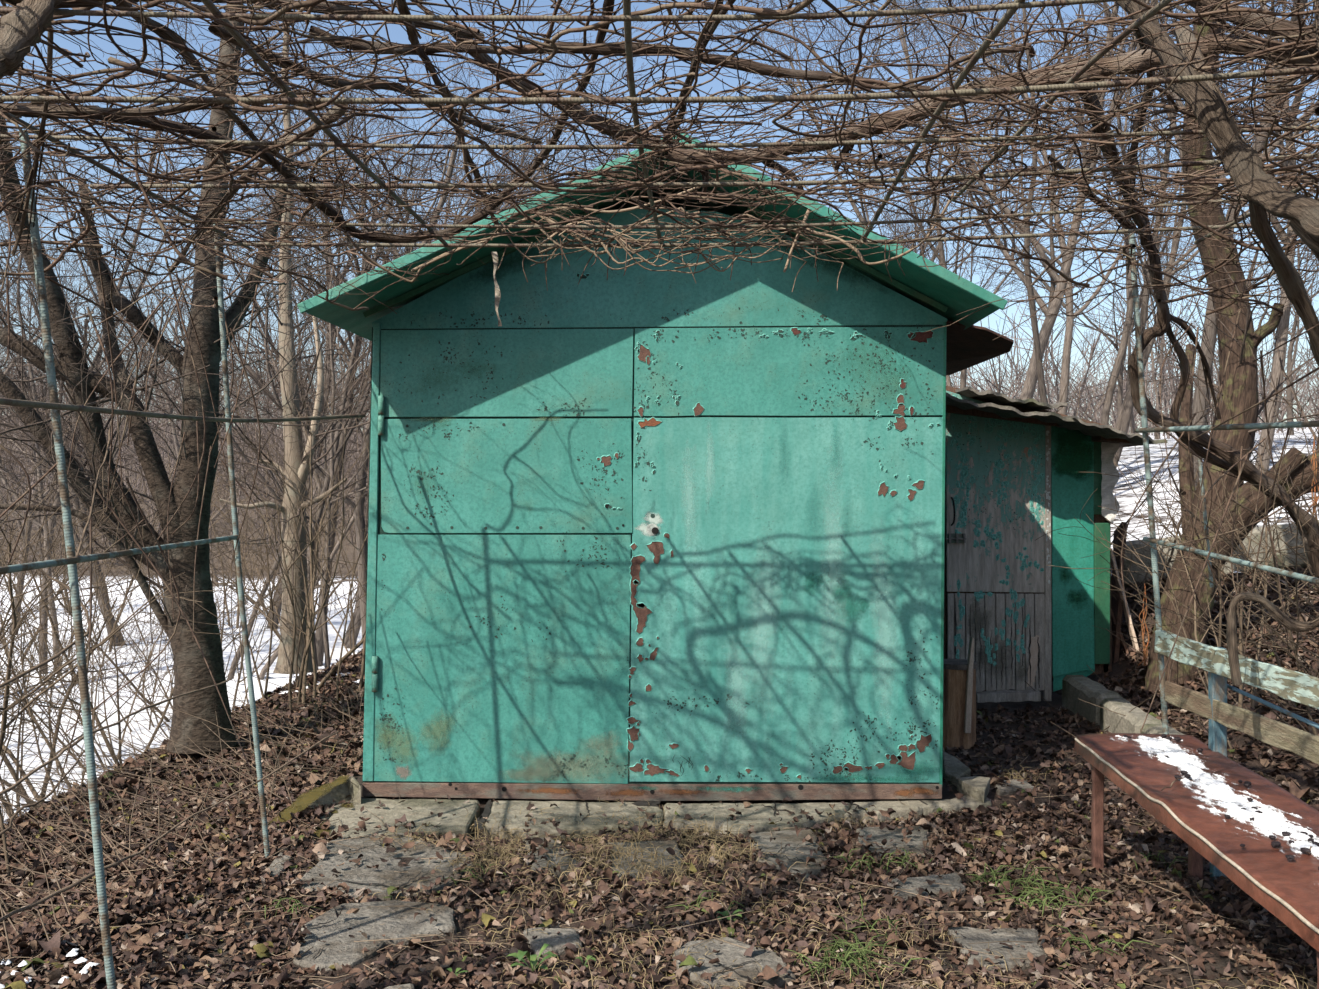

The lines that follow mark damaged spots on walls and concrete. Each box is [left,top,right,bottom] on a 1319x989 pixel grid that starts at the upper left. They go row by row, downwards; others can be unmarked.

peeling [574,309,705,511]
peeling [694,307,941,501]
peeling [549,531,754,779]
peeling [704,765,762,782]
water stain [807,523,891,665]
peeling [779,626,939,783]
peeling [952,420,1051,687]